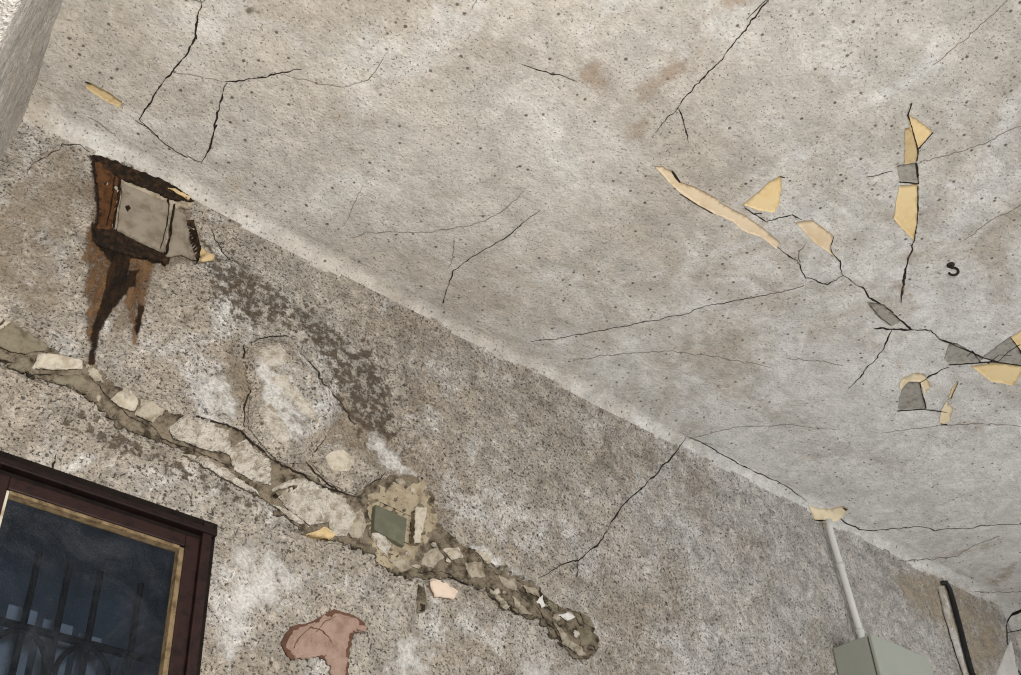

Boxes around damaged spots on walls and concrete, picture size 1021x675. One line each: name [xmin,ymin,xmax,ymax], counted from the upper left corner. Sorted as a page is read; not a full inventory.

crack [135,0,390,163]
crack [655,0,769,143]
corrosion [82,155,170,365]
crack [345,186,540,303]
spalling [654,165,785,249]
spalling [796,220,840,262]
spalling [868,302,900,327]
spalling [893,102,933,241]
spalling [897,372,959,425]
spalling [940,331,1021,385]
crack [539,424,836,578]
crack [970,591,1021,675]